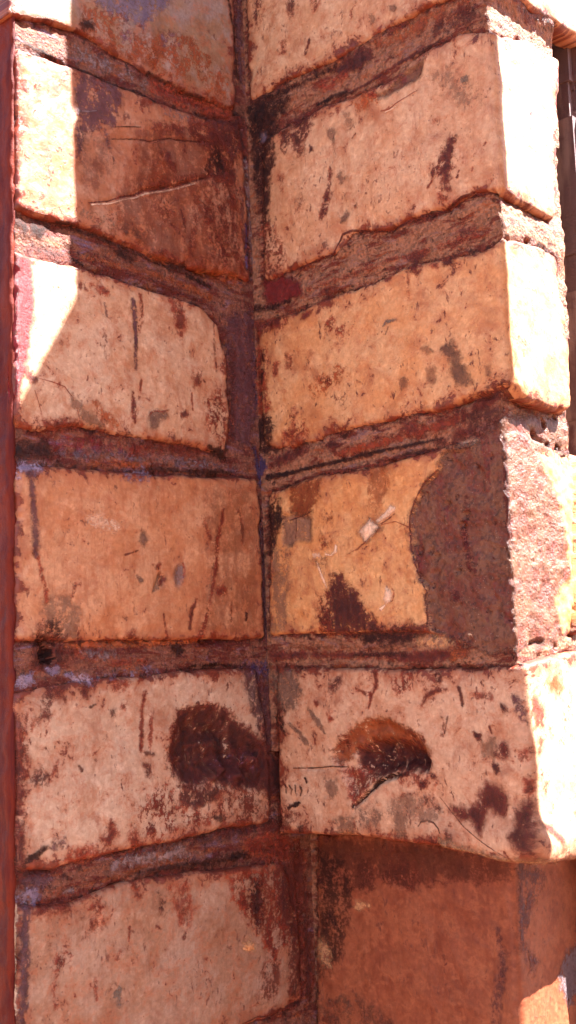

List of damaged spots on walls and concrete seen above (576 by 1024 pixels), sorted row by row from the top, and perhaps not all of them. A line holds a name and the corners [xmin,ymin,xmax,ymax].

crack [89,174,209,205]
corrosion [427,134,473,201]